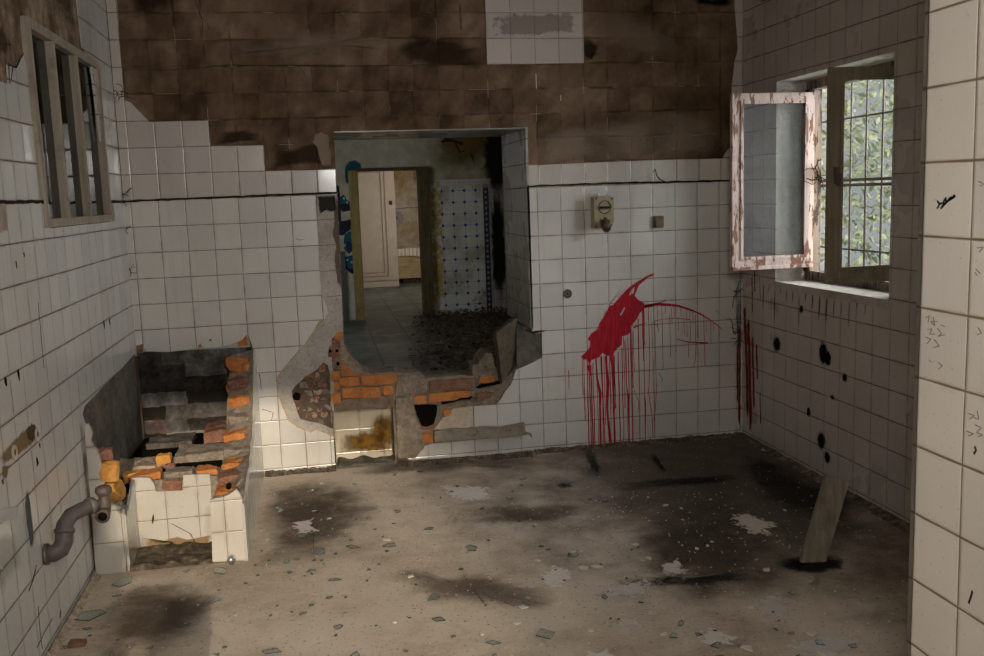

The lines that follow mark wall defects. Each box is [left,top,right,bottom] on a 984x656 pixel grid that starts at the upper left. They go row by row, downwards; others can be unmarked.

peeling [0,0,85,83]
peeling [117,0,738,171]
damp [442,136,506,293]
spalling [515,323,544,369]